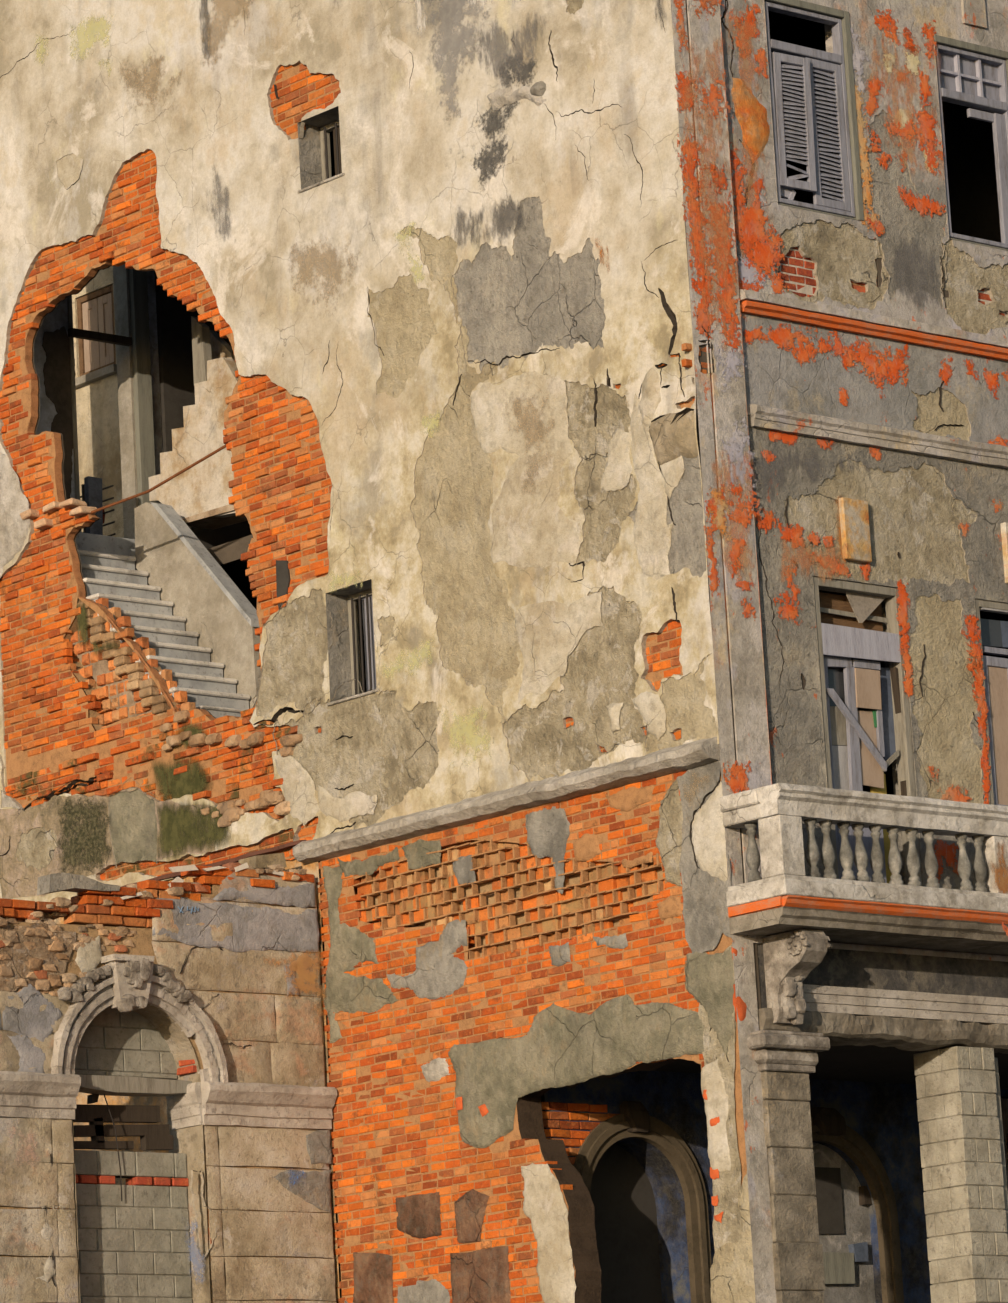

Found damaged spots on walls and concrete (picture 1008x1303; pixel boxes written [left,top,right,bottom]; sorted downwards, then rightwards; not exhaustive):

flaking render [267,60,341,140]
leakage [417,0,537,115]
leakage [473,101,518,181]
peeling [658,0,1008,441]
peeling [0,149,441,899]
peeling [368,197,717,781]
crack [593,240,713,525]
peeling [666,416,991,804]
peeling [934,839,959,883]